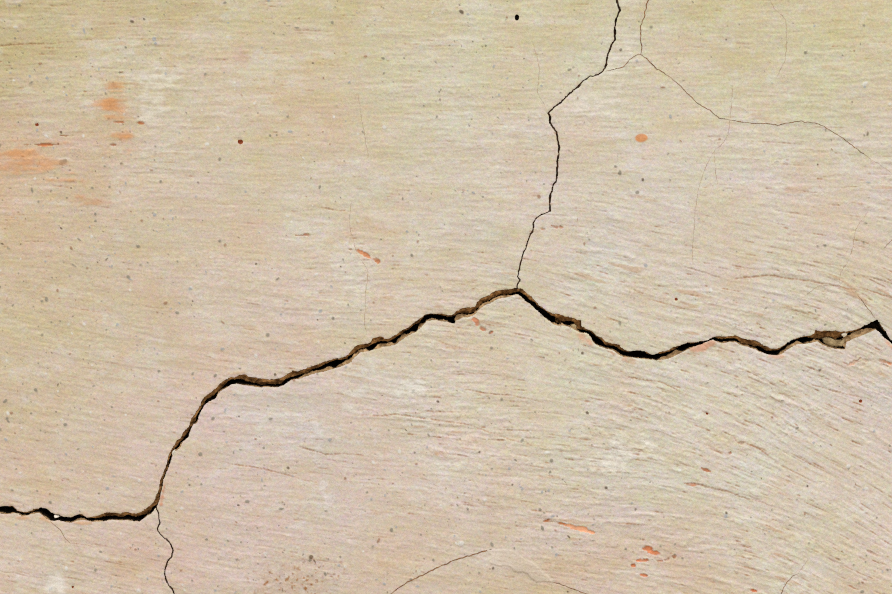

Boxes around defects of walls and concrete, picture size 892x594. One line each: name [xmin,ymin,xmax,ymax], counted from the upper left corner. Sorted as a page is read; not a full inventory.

crack [515,0,621,289]
crack [608,0,665,74]
crack [675,81,868,157]
crack [0,288,892,594]